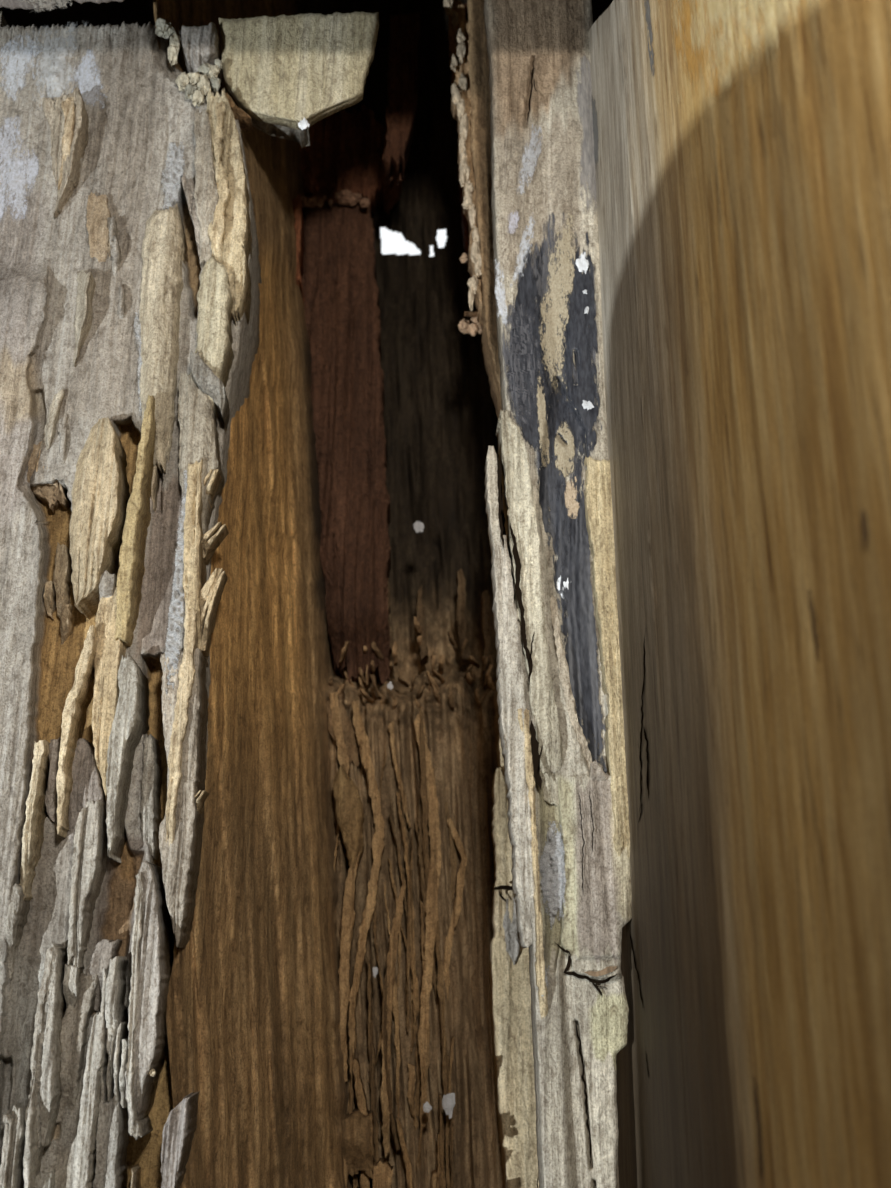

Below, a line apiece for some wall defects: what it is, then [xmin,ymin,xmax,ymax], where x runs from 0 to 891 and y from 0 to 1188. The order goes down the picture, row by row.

peeling [39,87,230,475]
peeling [575,252,589,274]
peeling [27,388,130,620]
crack [638,627,649,822]
peeling [161,1091,200,1188]